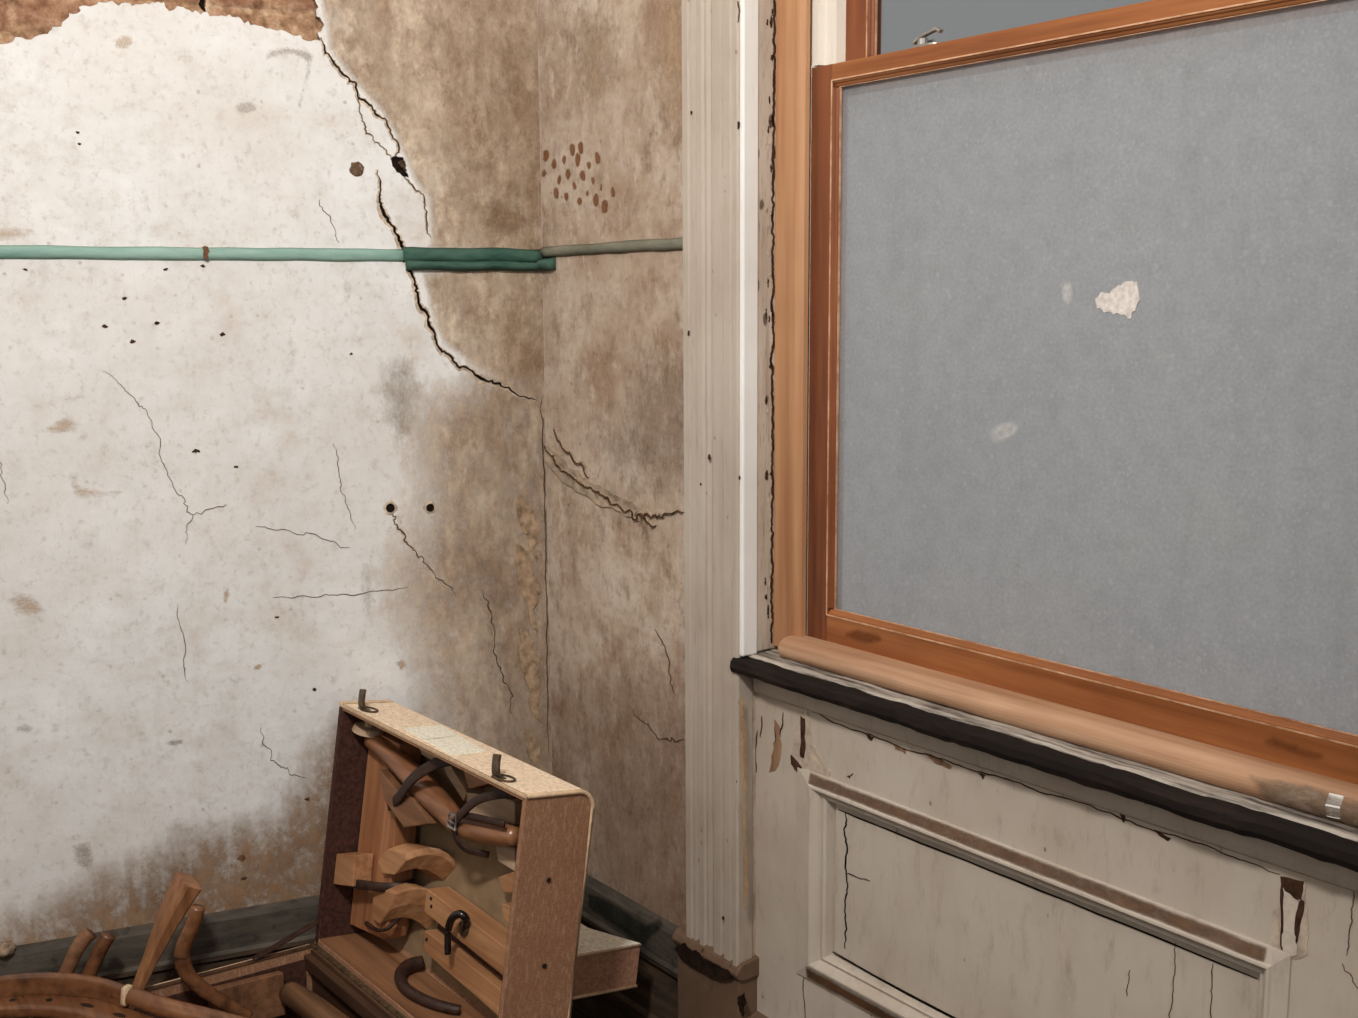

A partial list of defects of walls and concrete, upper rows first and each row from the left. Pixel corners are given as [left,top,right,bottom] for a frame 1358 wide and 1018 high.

spalling [0,0,324,61]
corrosion [542,142,615,213]
crack [110,374,227,544]
crack [256,444,356,548]
crack [273,37,684,752]
crack [177,608,187,681]
damp [4,742,336,946]
crack [260,727,306,778]
peeling [769,707,1309,960]
crack [833,809,1257,1018]